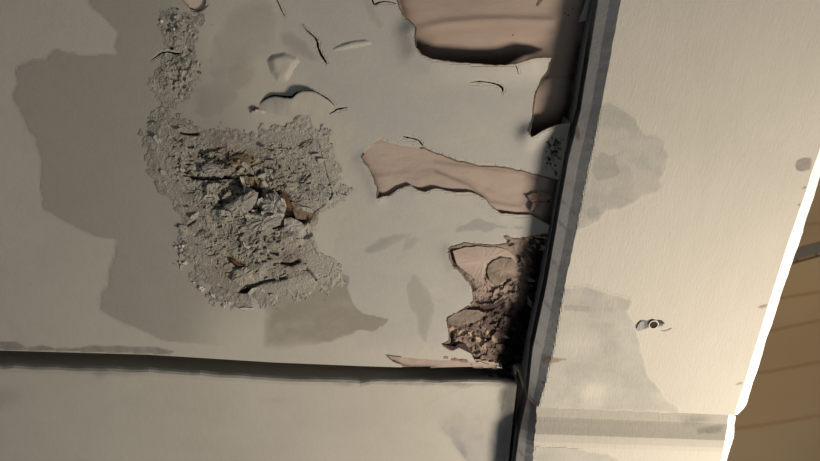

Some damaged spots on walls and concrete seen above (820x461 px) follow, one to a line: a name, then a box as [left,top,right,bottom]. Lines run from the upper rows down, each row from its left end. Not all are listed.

damp [11,0,387,347]
spalling [138,0,353,311]
crack [303,25,327,63]
peeling [361,139,558,373]
peeling [398,0,591,138]